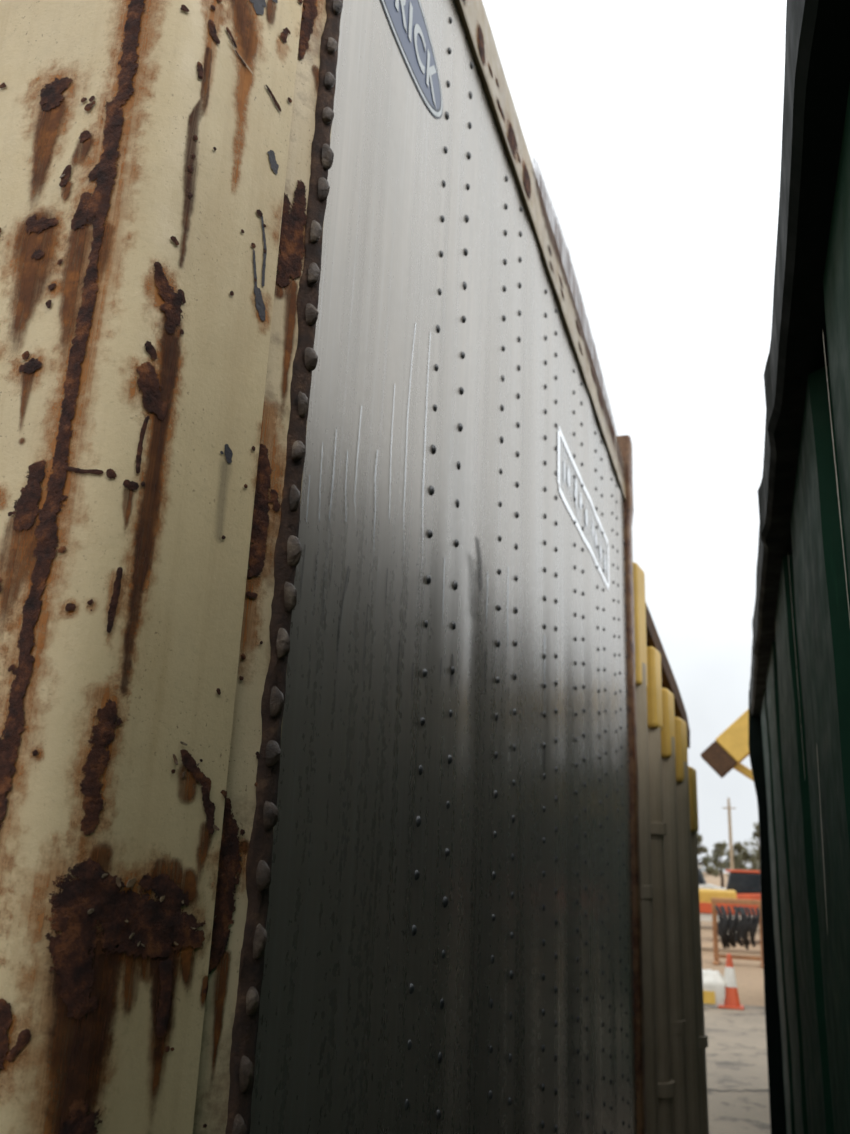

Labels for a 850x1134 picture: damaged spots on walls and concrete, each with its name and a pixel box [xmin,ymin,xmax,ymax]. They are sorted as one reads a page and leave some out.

corrosion [0,66,87,444]
corrosion [22,47,250,1134]
peeling [197,0,291,186]
corrosion [241,180,307,660]
corrosion [298,0,323,91]
corrosion [477,24,625,478]
corrosion [0,998,31,1074]